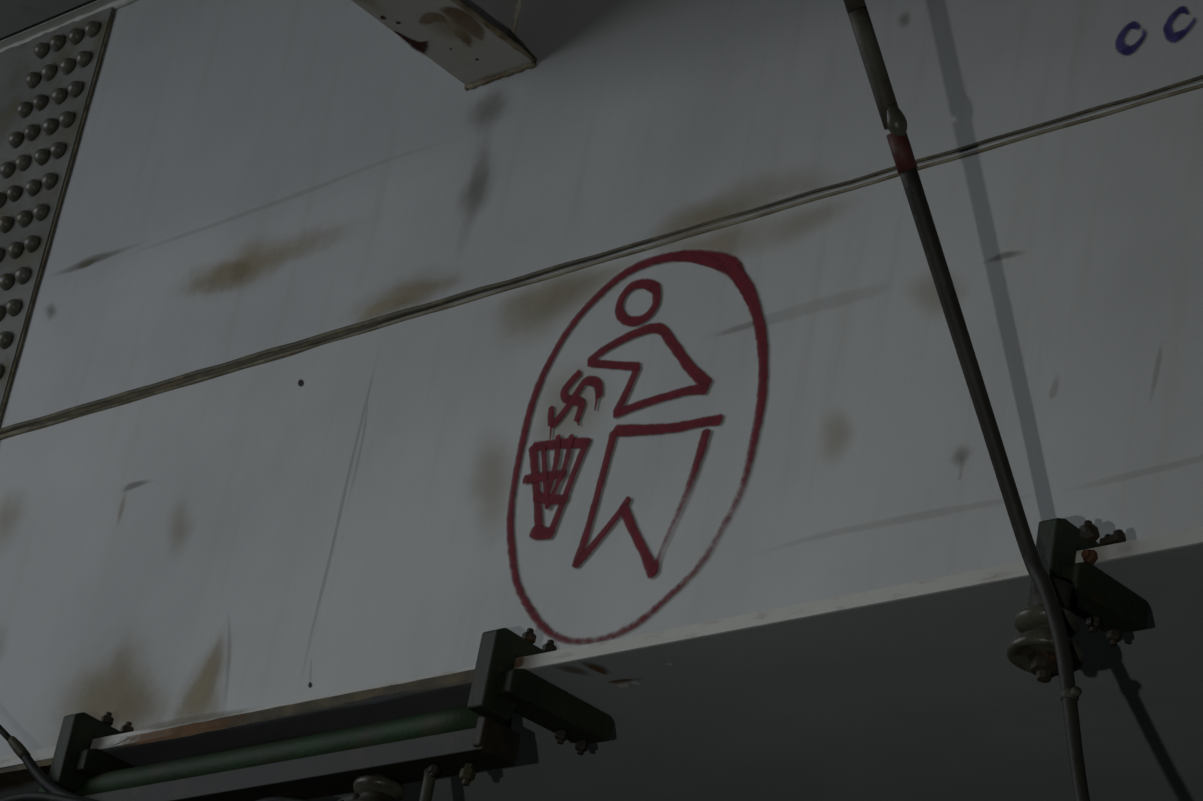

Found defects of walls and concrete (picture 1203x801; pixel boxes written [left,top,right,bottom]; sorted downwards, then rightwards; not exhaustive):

corrosion [421,8,483,50]